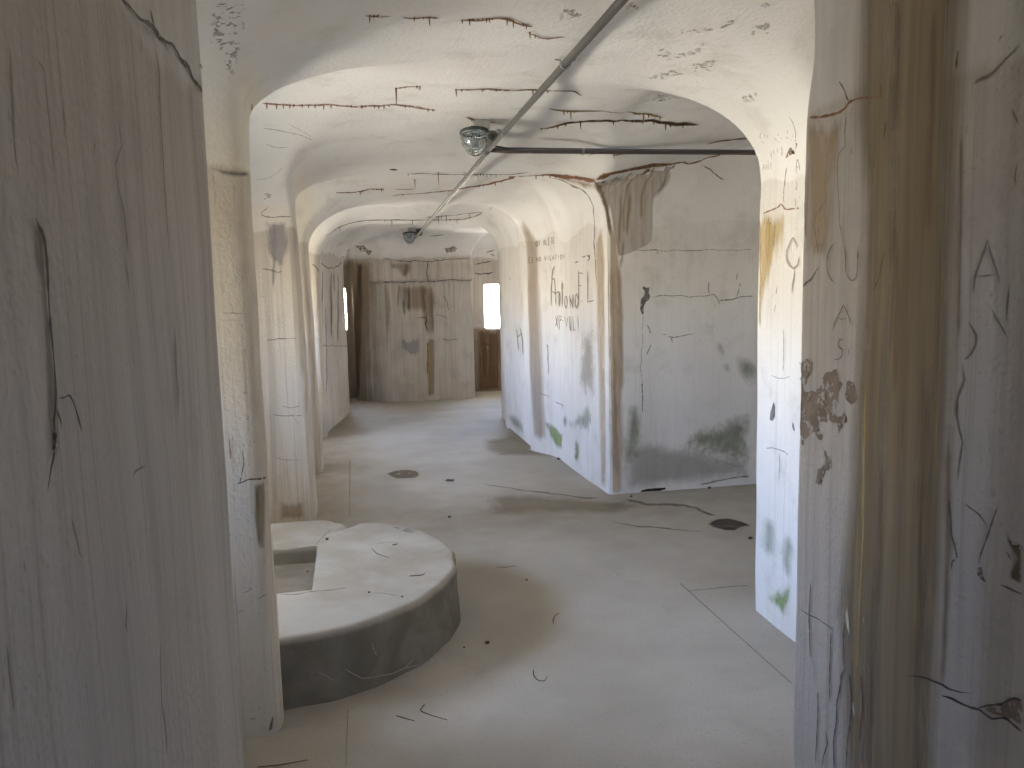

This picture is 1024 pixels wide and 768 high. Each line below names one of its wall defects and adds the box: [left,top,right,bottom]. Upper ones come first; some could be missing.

crack [122,0,202,92]
peeling [211,4,245,74]
damp [270,225,285,282]
crack [327,89,747,343]
crack [35,218,82,487]
crack [640,249,787,379]
peeling [792,359,857,484]
crack [948,500,1010,568]
crack [905,676,1022,732]